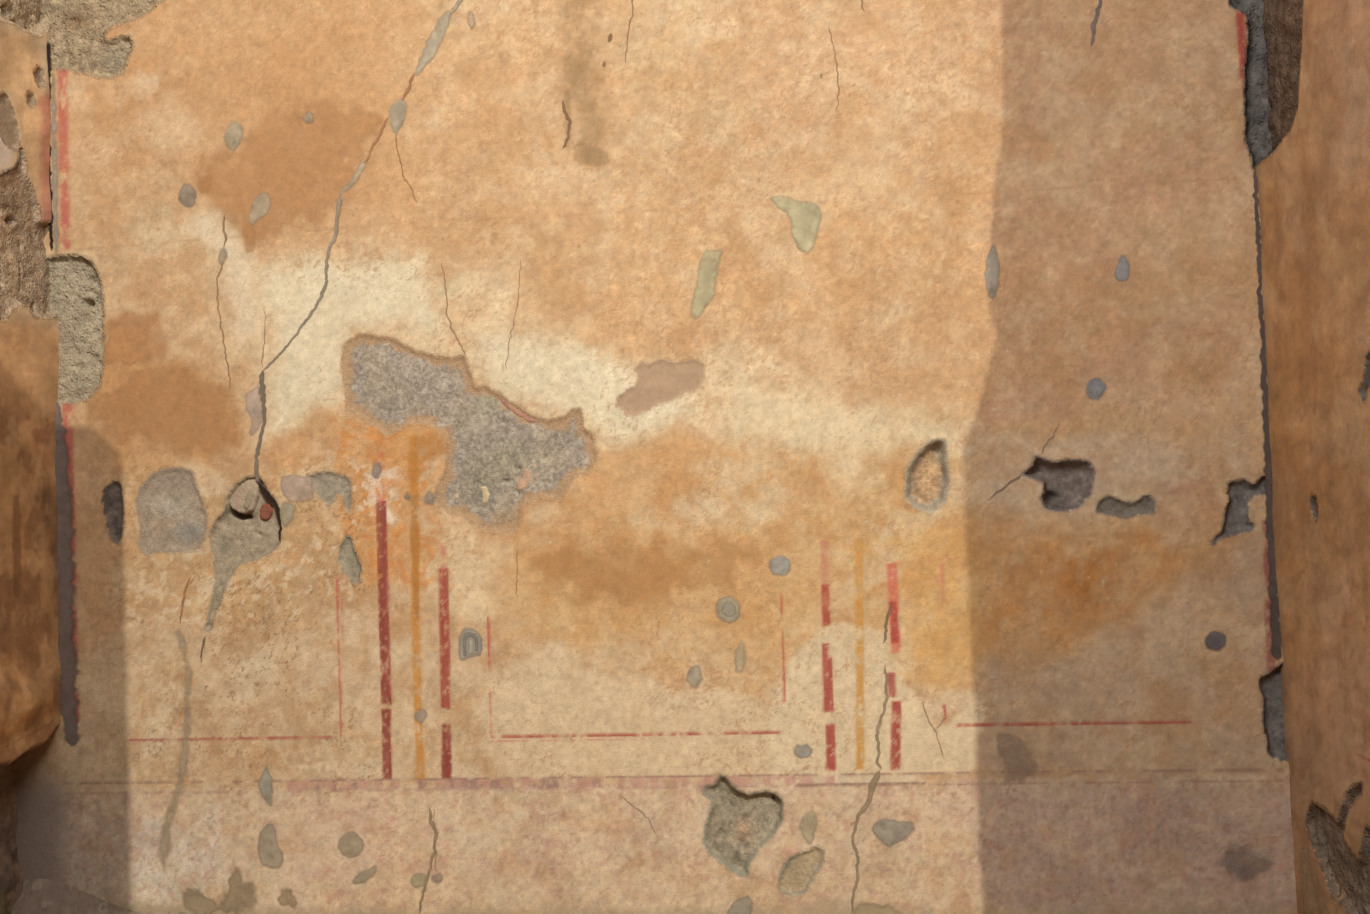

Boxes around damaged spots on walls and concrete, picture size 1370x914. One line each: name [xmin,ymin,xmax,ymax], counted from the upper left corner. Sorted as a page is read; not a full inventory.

crack [451,0,462,13]
crack [366,74,416,200]
spalling [0,0,166,405]
crack [216,195,342,542]
crack [441,263,465,353]
spalling [100,466,283,633]
spalling [339,332,599,537]
spalling [903,437,952,516]
spalling [1019,454,1158,521]
crack [851,603,892,912]
crack [923,704,945,755]
spalling [700,772,786,879]